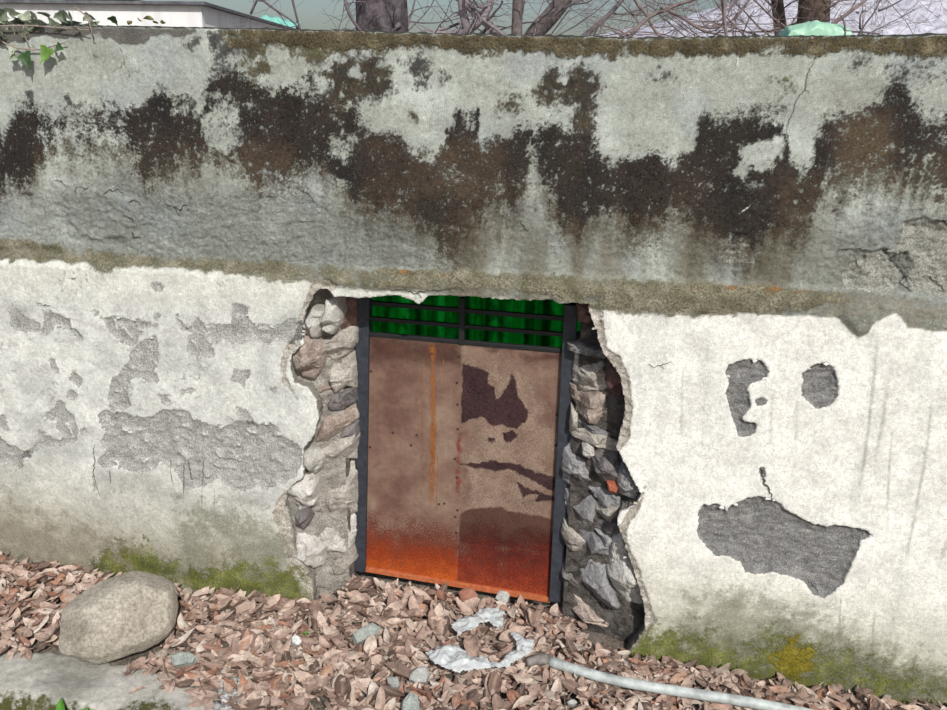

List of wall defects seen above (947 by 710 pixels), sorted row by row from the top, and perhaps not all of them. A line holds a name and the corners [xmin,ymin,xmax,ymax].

damp [0,24,947,275]
crack [782,60,815,184]
crack [839,248,944,291]
peeling [92,310,312,589]
peeling [175,277,339,395]
peeling [461,364,528,443]
spalling [589,305,634,451]
spalling [725,359,770,437]
spalling [802,363,839,409]
corrosion [366,513,552,596]
spalling [697,496,872,598]
damp [681,596,947,705]